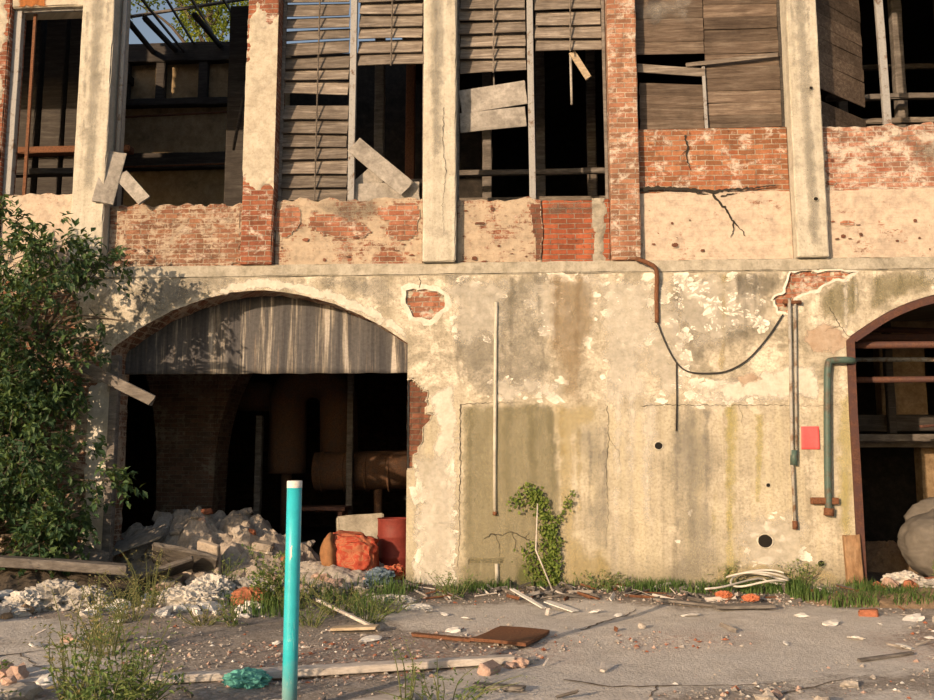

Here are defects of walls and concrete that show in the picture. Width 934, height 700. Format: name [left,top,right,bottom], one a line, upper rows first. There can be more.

flaking render [0,0,10,52]
crack [640,135,776,236]
spalling [275,204,372,249]
spalling [377,202,420,256]
spalling [525,203,543,261]
flaking render [592,198,607,261]
spalling [830,220,863,240]
peeling [209,275,508,343]
peeling [524,269,859,409]
peeling [407,378,459,586]
leakage [463,406,560,587]